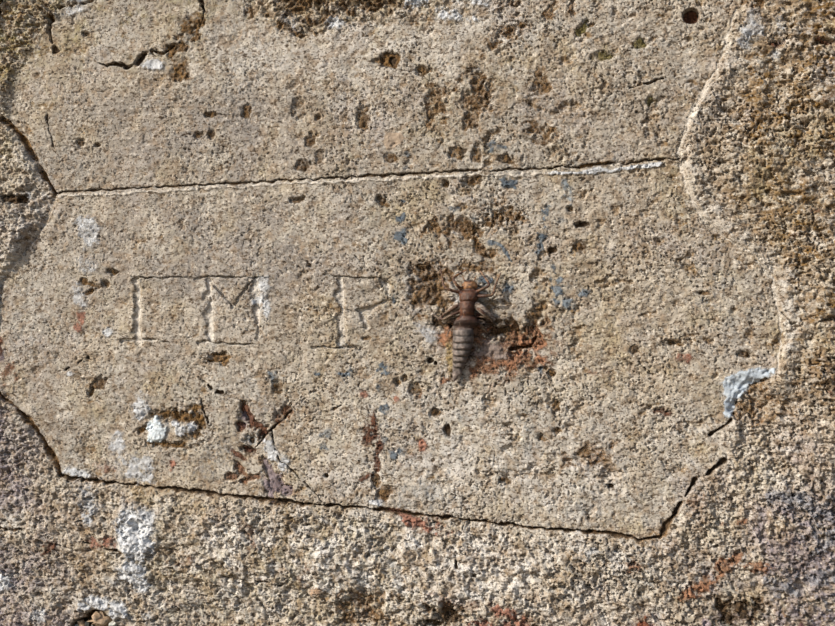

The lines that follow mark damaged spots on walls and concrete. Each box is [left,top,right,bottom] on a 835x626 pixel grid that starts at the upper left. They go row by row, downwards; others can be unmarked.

crack [0,0,94,42]
crack [101,46,175,70]
crack [198,376,224,423]
crack [708,418,732,436]
crack [256,410,323,502]
crack [685,458,727,496]
spalling [75,609,117,626]